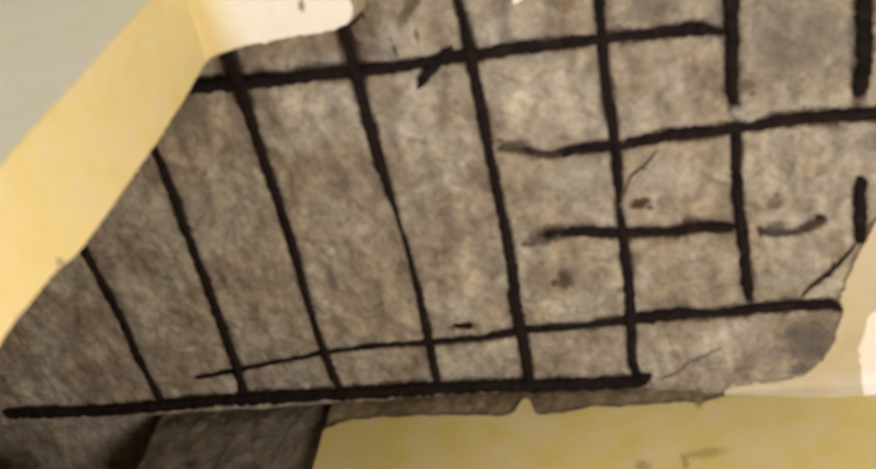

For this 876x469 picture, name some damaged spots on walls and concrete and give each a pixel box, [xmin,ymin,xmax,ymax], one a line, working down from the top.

spalling [134,0,876,429]
crack [657,348,721,380]